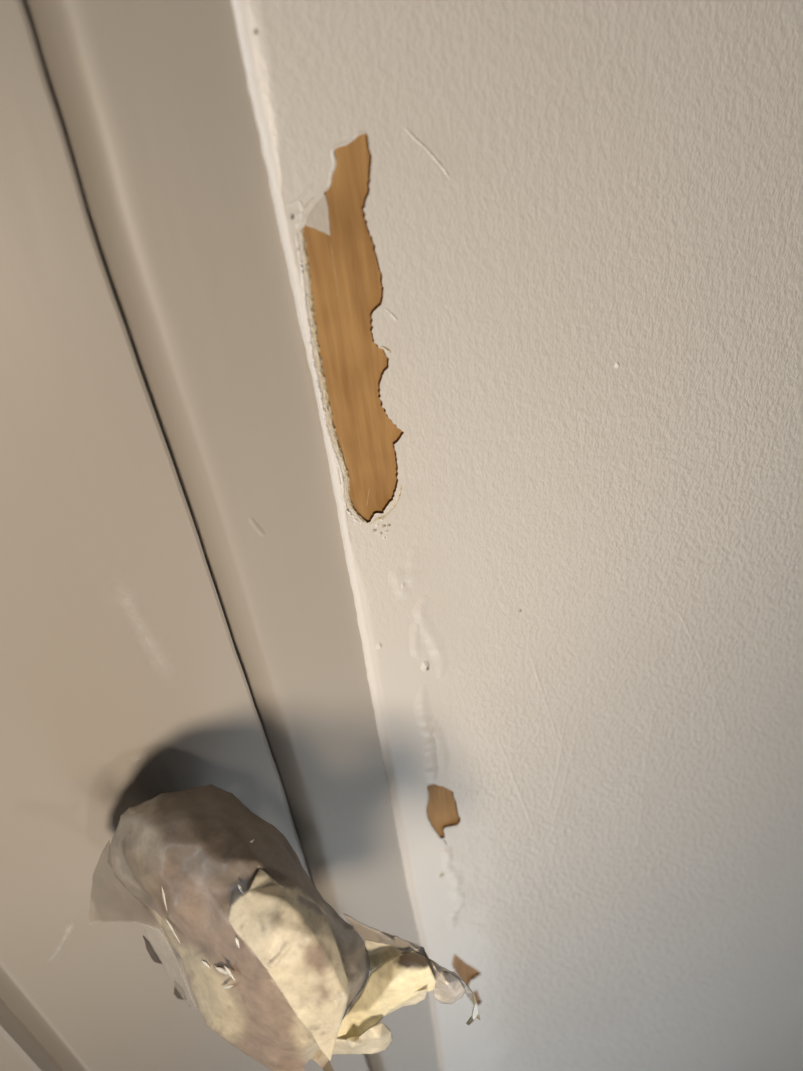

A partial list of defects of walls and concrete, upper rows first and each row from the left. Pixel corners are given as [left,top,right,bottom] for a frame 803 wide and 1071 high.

peeling [286,131,402,540]
peeling [424,784,461,844]
peeling [452,954,481,1003]